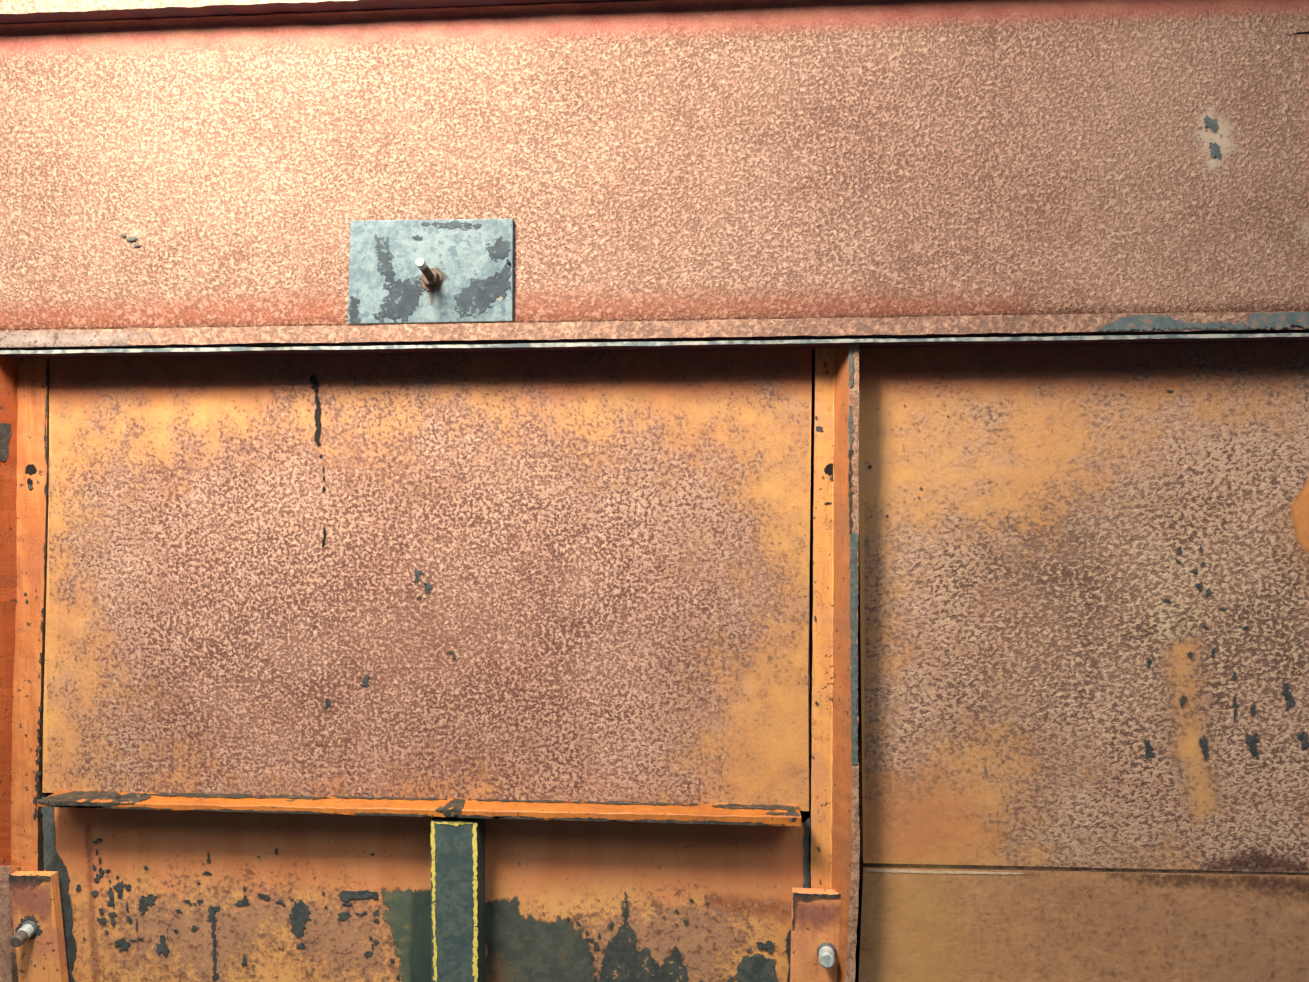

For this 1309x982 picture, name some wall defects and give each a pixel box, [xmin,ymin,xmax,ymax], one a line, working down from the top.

peeling [1191,106,1236,170]
peeling [411,219,481,240]
rust [1,299,338,324]
peeling [348,234,424,323]
peeling [452,236,511,318]
rust [524,296,901,315]
peeling [1096,312,1309,332]
rust [47,351,810,804]
rust [865,342,1309,982]
peeling [8,705,841,982]
rust [88,830,401,982]
rust [573,890,753,982]